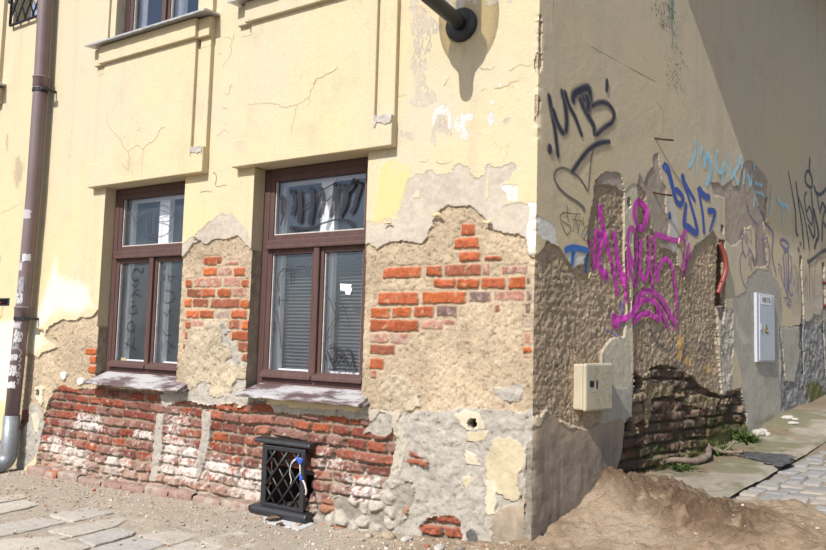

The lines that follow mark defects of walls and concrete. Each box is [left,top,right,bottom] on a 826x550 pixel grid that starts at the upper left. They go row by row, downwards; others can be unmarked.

crack [217,33,336,135]
flaking render [10,152,770,542]